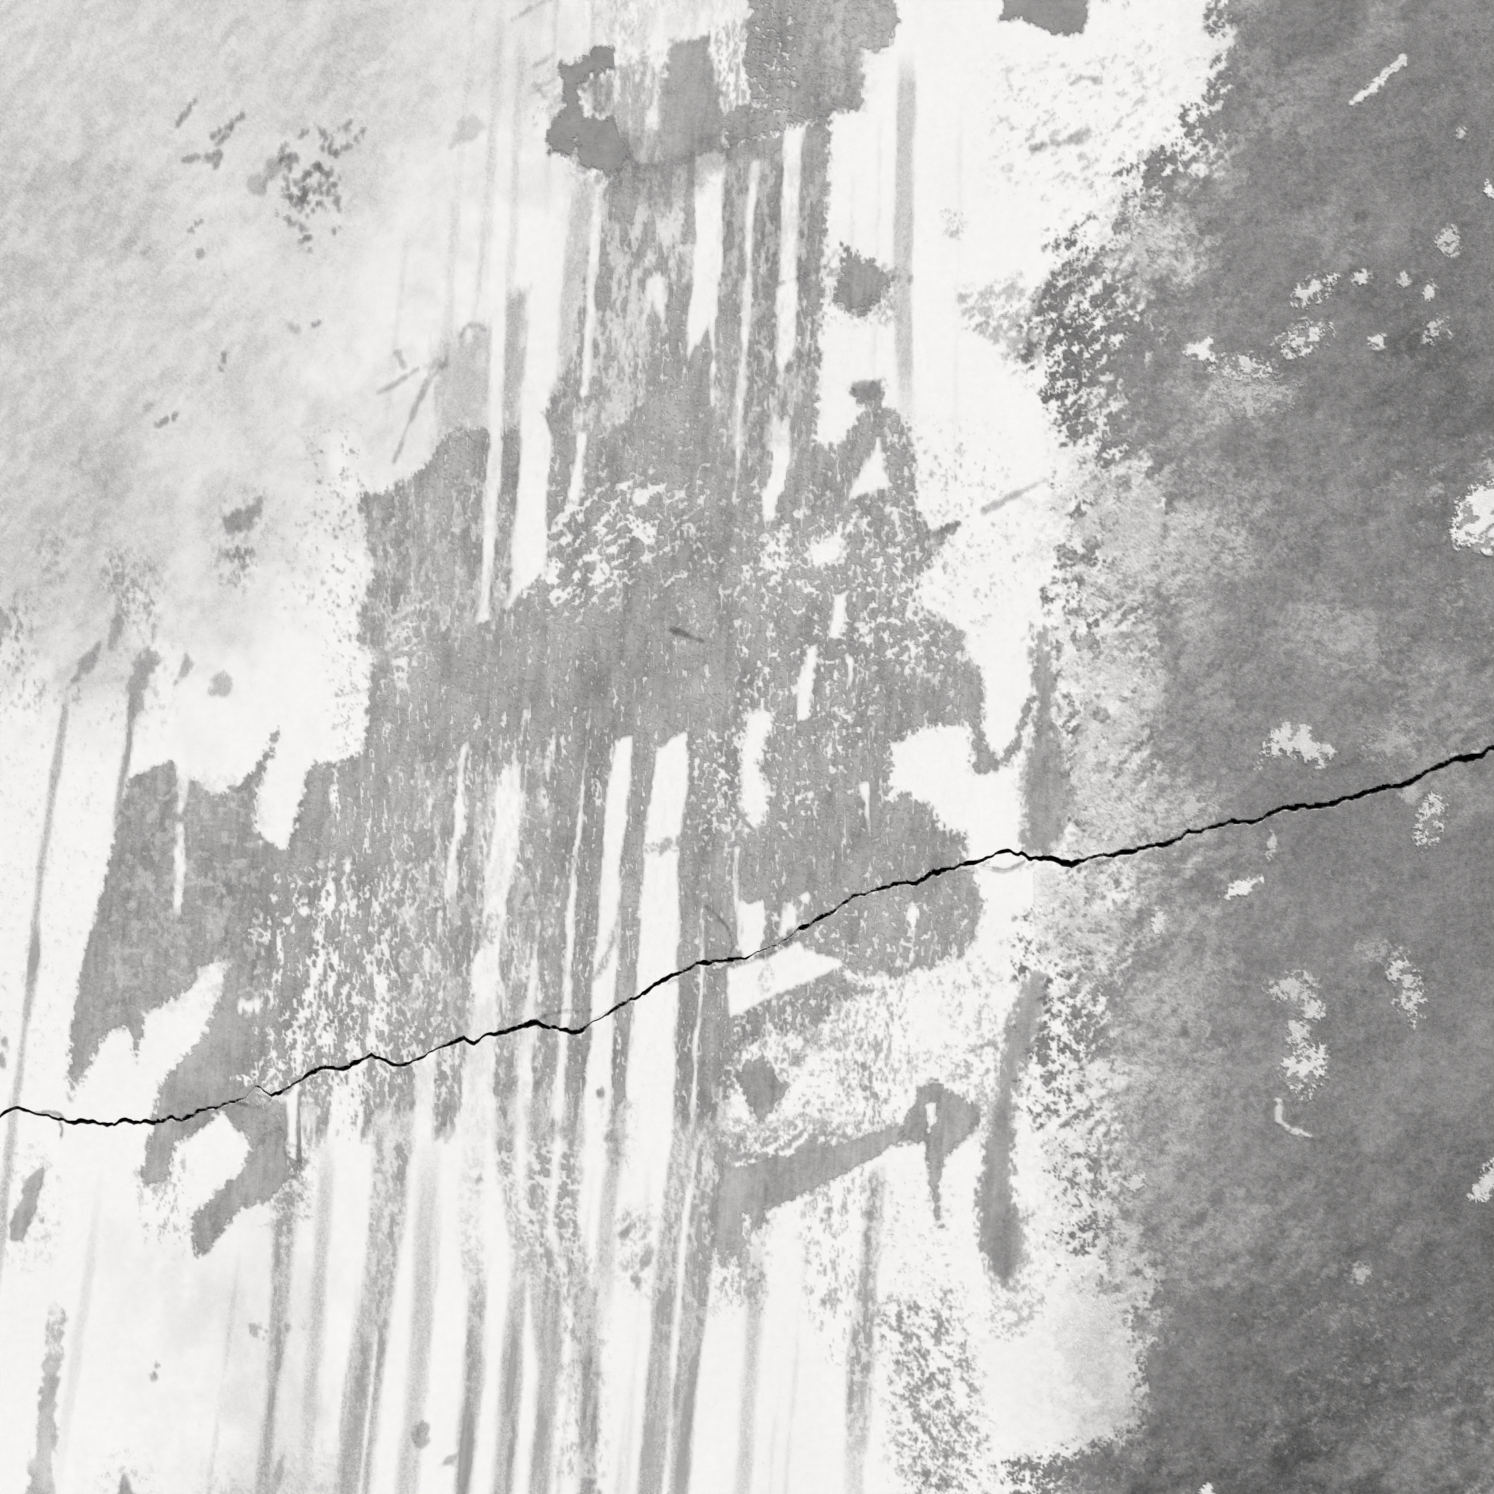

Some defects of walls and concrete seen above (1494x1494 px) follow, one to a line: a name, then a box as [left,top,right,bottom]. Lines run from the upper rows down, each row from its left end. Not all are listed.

damp [116,695,135,819]
damp [25,915,40,1018]
crack [0,745,1494,1128]
damp [261,1195,298,1479]
damp [342,1136,409,1492]
damp [457,1273,482,1494]
damp [495,1126,579,1494]
damp [581,1332,598,1456]
damp [639,1124,727,1494]
damp [848,1179,879,1421]